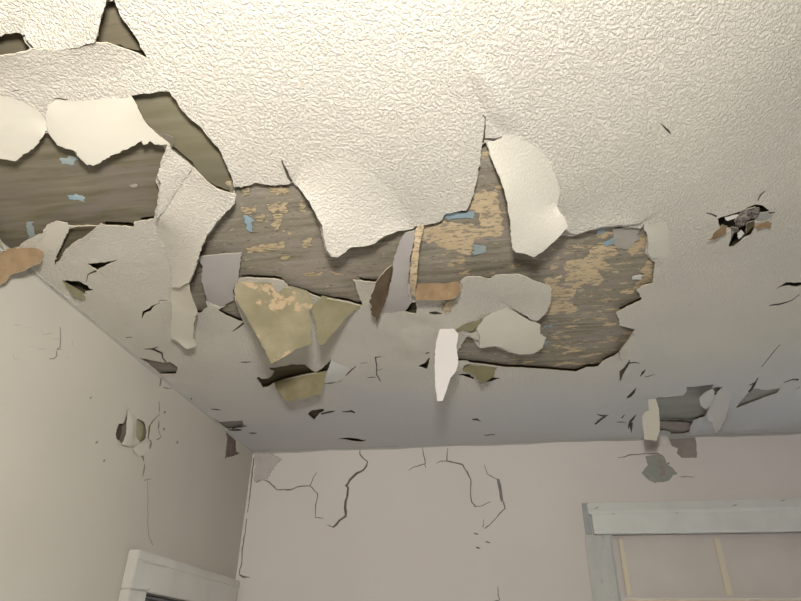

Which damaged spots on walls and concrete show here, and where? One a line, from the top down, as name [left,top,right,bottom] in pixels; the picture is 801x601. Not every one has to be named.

peeling [0,96,174,285]
peeling [189,115,669,402]
peeling [707,214,738,240]
peeling [754,211,772,229]
peeling [143,347,177,373]
crack [141,378,173,569]
crack [239,438,368,578]
crack [409,448,506,549]
peeling [618,385,731,483]